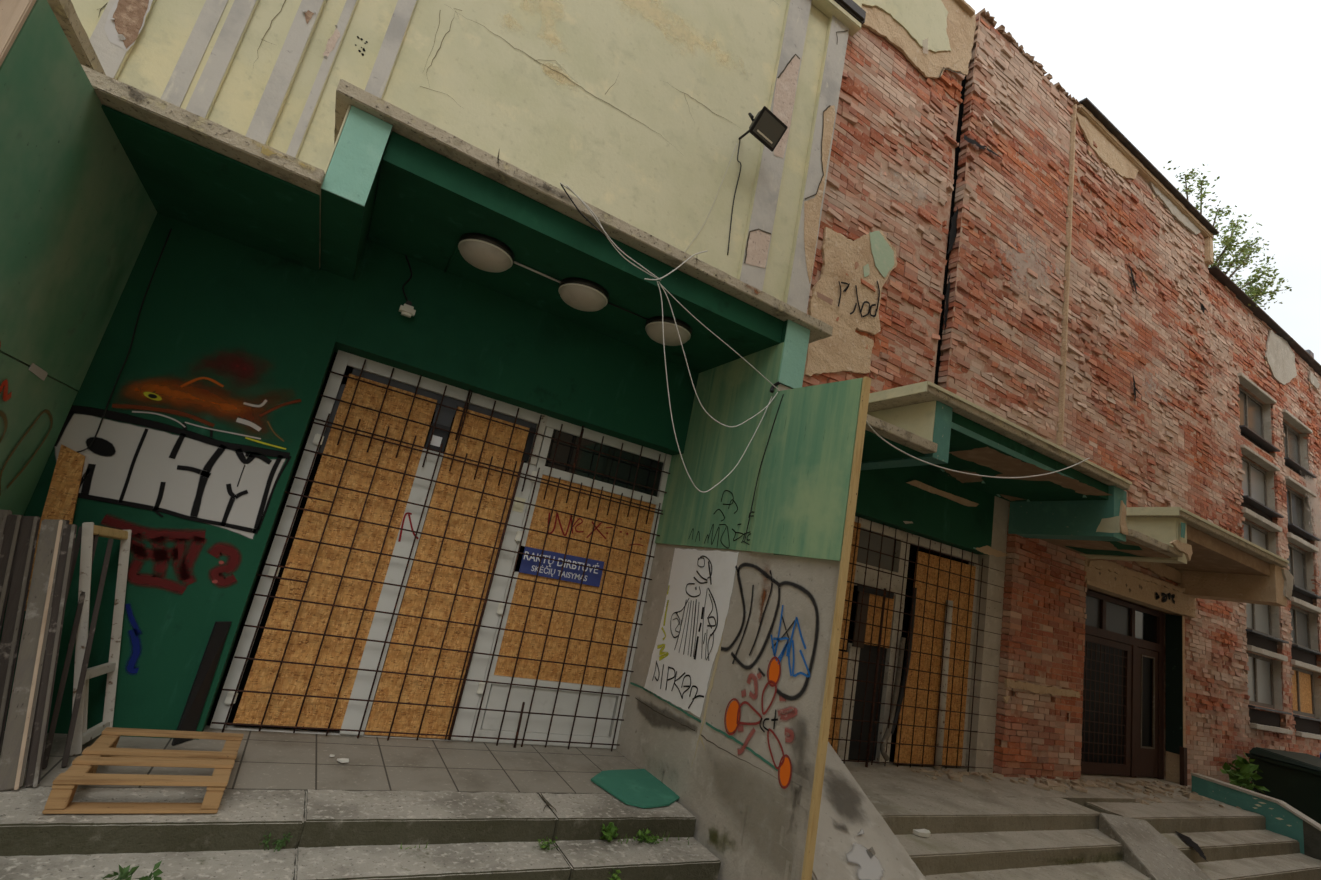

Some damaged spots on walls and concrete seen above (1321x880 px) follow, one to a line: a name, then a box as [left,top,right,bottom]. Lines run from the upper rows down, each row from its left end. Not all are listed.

spalling [104,0,153,51]
crack [420,7,682,154]
spalling [773,54,801,158]
flaking render [804,105,898,377]